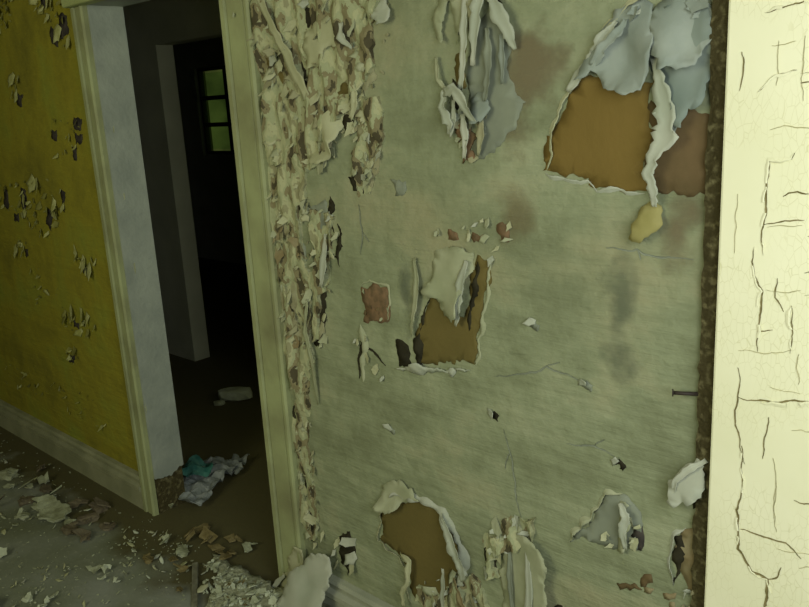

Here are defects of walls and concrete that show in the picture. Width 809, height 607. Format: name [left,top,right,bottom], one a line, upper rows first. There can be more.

peeling [28,0,70,50]
crack [766,0,809,13]
crack [739,41,809,95]
peeling [543,75,709,197]
peeling [246,0,390,549]
peeling [415,218,513,365]
crack [734,153,809,607]
peeling [330,531,357,575]
peeling [380,502,458,607]
flaking render [569,489,645,554]
flaking render [667,528,694,607]
peeling [666,458,708,509]